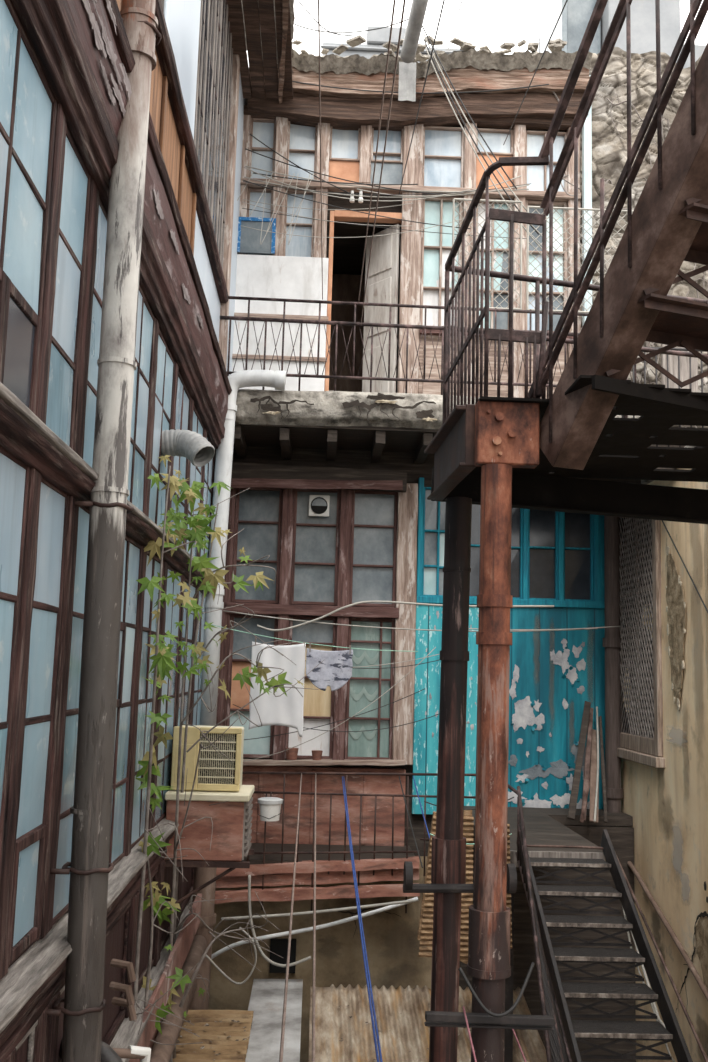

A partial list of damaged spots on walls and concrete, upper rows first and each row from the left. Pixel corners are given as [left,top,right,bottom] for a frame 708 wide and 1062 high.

peeling [82,0,132,119]
peeling [550,638,586,694]
peeling [508,664,590,809]
spalling [693,881,708,988]